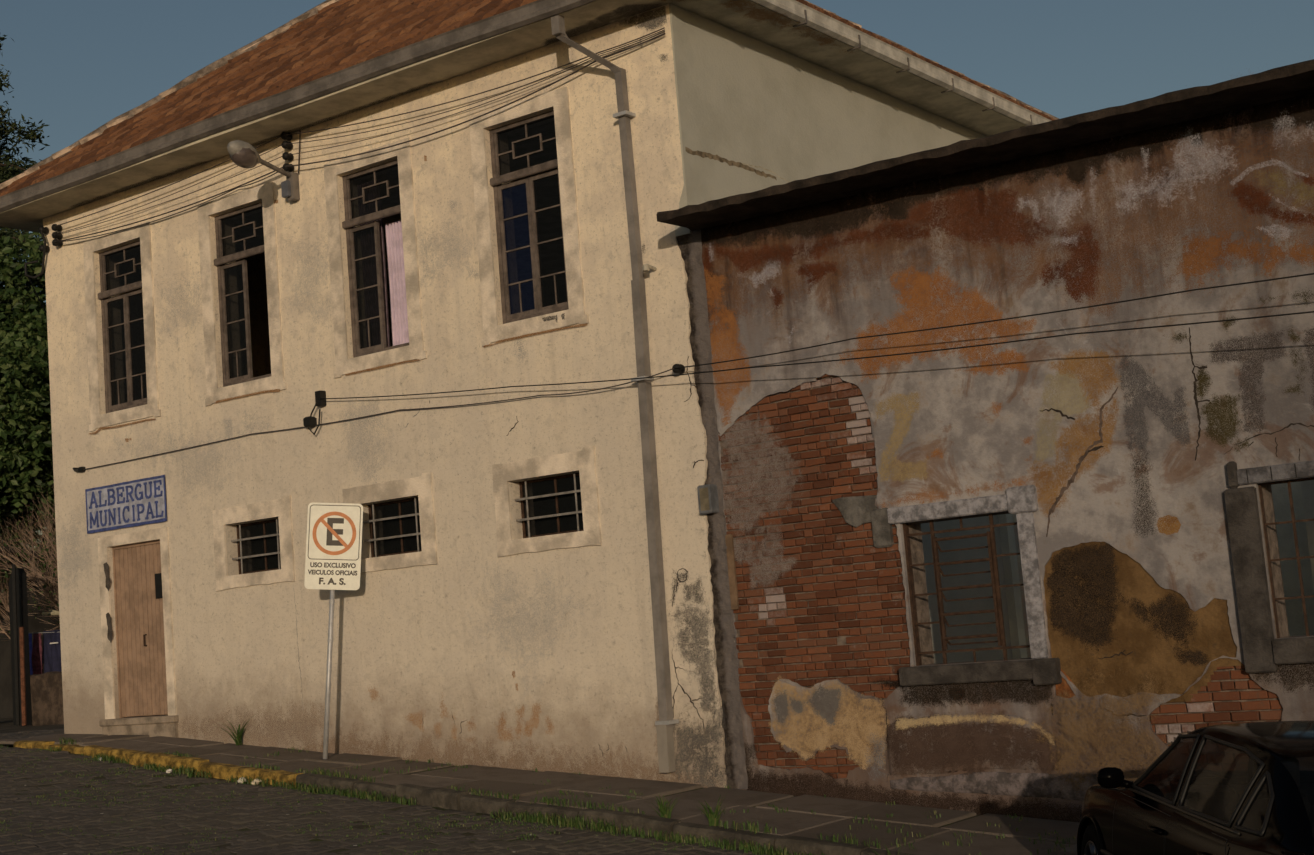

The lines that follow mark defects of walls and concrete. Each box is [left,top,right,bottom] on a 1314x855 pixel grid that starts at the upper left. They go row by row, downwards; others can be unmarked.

damp [701,93,1314,349]
flaking render [676,229,1098,801]
crack [1040,387,1118,537]
crack [1189,327,1314,461]
damp [178,559,730,788]
damp [745,542,1208,822]
peeling [1044,542,1283,746]